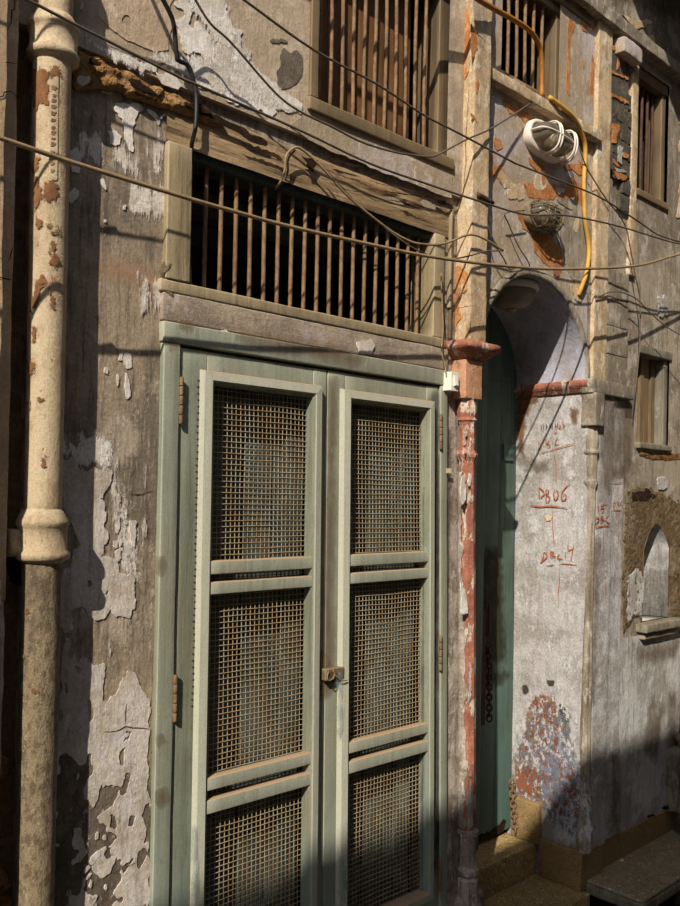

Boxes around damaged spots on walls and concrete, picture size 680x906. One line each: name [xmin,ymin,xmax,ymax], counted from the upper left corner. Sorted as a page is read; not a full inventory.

corrosion [32,64,62,111]
peeling [503,99,534,123]
flaking render [610,45,632,214]
corrosion [29,156,60,312]
peeling [136,261,174,316]
peeling [489,138,592,304]
spalling [622,477,680,633]
peeling [54,429,152,906]
peeling [511,680,596,847]